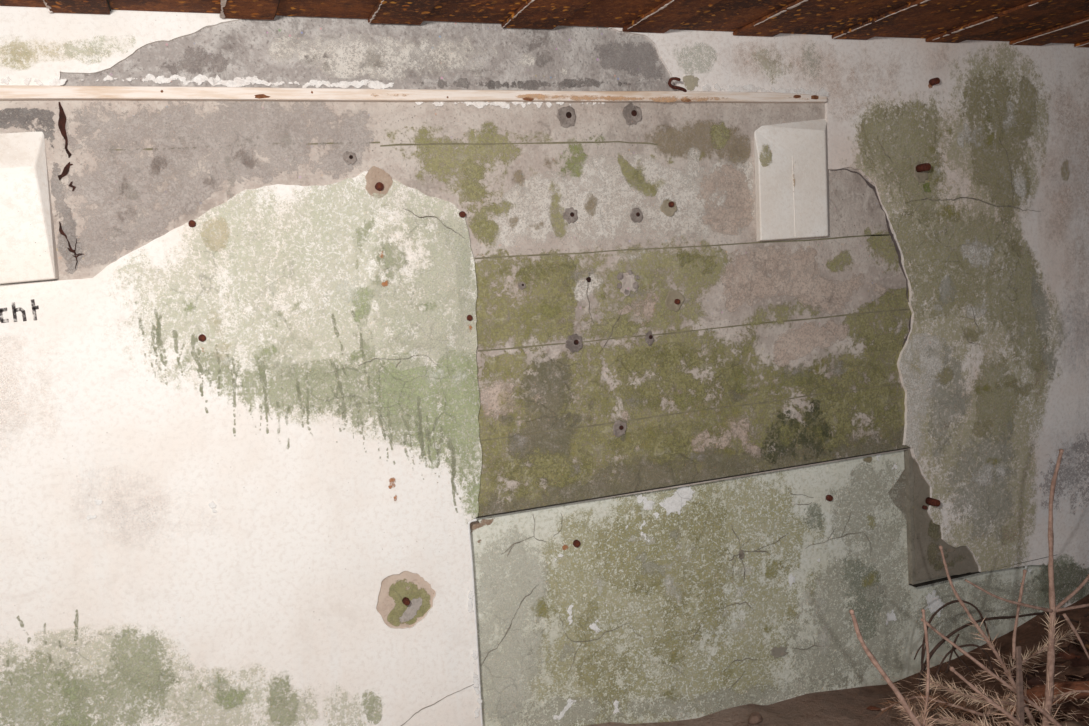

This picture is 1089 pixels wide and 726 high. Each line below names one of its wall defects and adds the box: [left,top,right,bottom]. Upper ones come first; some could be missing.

crack [58,102,76,191]
crack [59,221,82,269]
flaking render [0,16,979,617]
water stain [139,313,243,436]
water stain [249,357,311,434]
water stain [332,363,461,512]
flaking render [376,571,435,628]